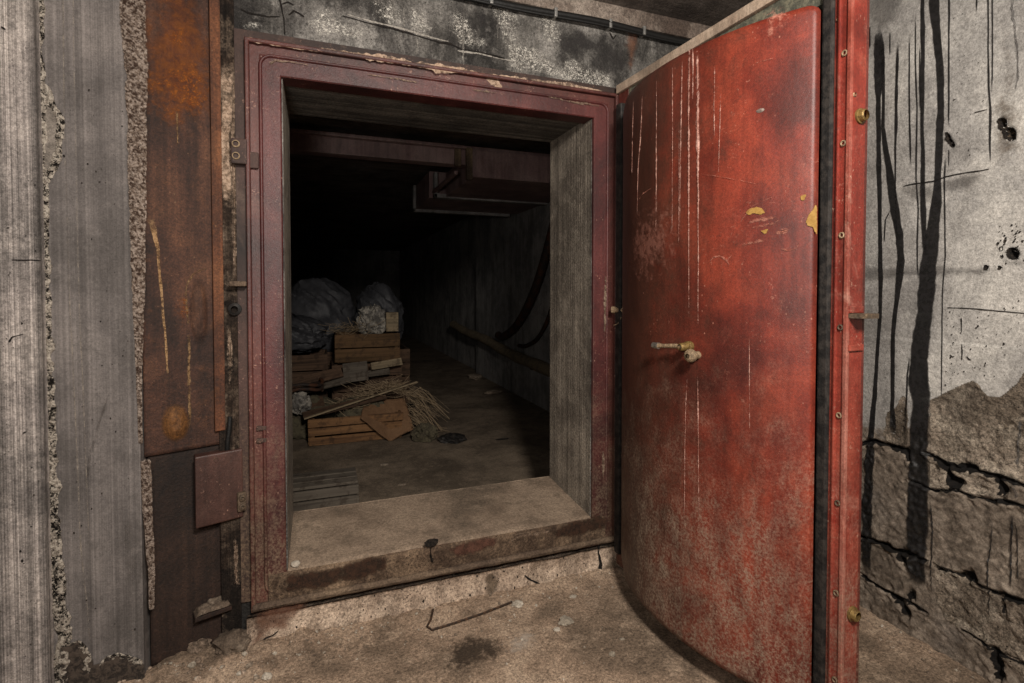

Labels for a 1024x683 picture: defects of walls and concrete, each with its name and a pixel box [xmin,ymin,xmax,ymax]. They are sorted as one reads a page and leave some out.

peeling [342,50,474,74]
peeling [477,74,600,104]
spalling [997,117,1017,141]
water stain [861,0,950,588]
spalling [883,396,908,447]
spalling [929,357,1024,498]
crack [862,440,1024,509]
crack [861,535,1024,615]
spalling [933,560,1024,678]
spalling [60,640,145,683]
crack [963,630,1024,682]